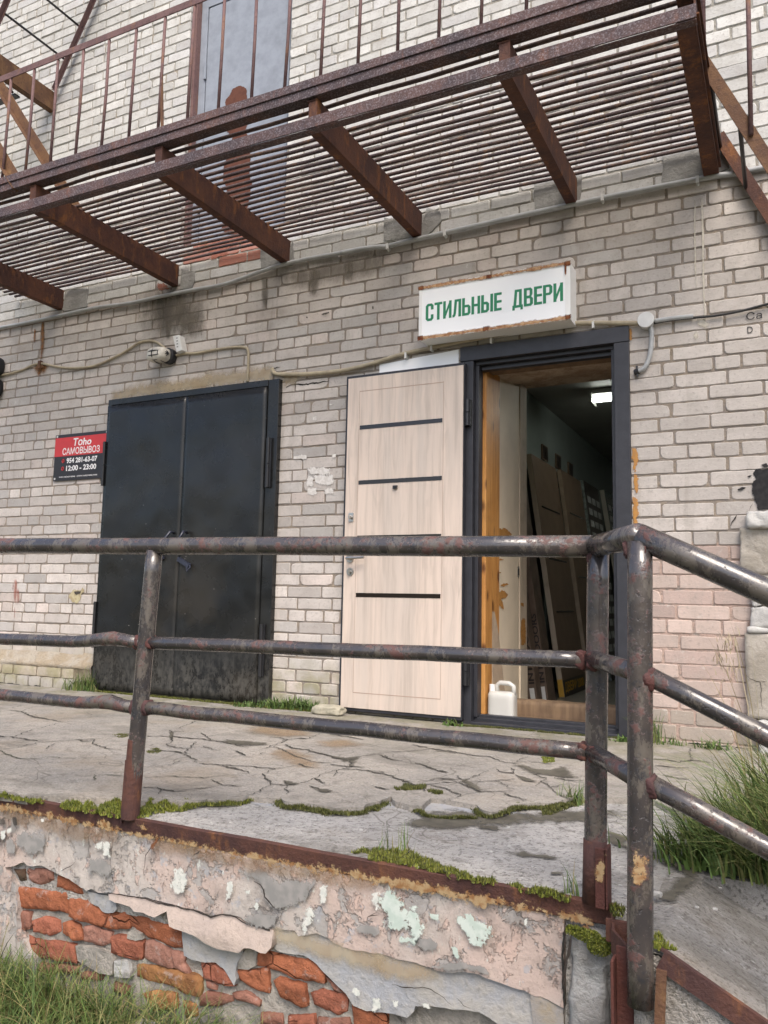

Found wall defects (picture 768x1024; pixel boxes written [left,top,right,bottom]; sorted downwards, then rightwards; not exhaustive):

corrosion [418,261,571,290]
corrosion [417,314,571,341]
crack [0,682,120,780]
crack [144,720,574,800]
crack [654,738,739,779]
flaking render [0,819,45,855]
flaking render [87,841,111,879]
spalling [510,851,558,859]
flaking render [14,867,565,1024]
crack [561,931,572,1014]